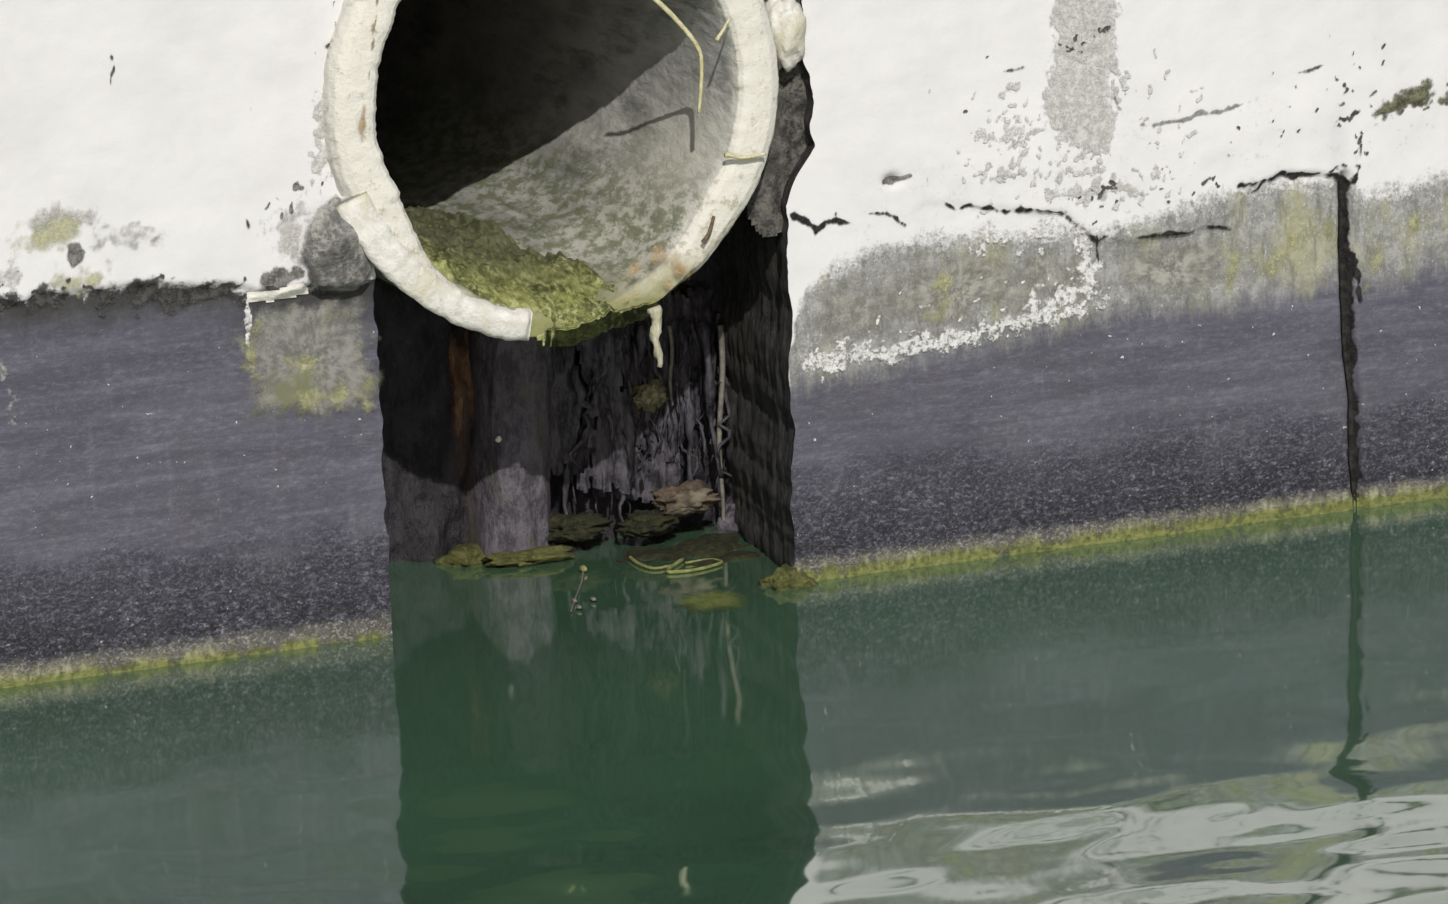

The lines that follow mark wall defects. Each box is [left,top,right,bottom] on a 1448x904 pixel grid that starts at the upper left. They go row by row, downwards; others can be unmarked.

peeling [957,0,1220,232]
spalling [260,266,305,291]
water stain [802,213,1110,383]
crack [945,203,1230,262]
water stain [1122,241,1223,291]
crack [1237,144,1363,506]